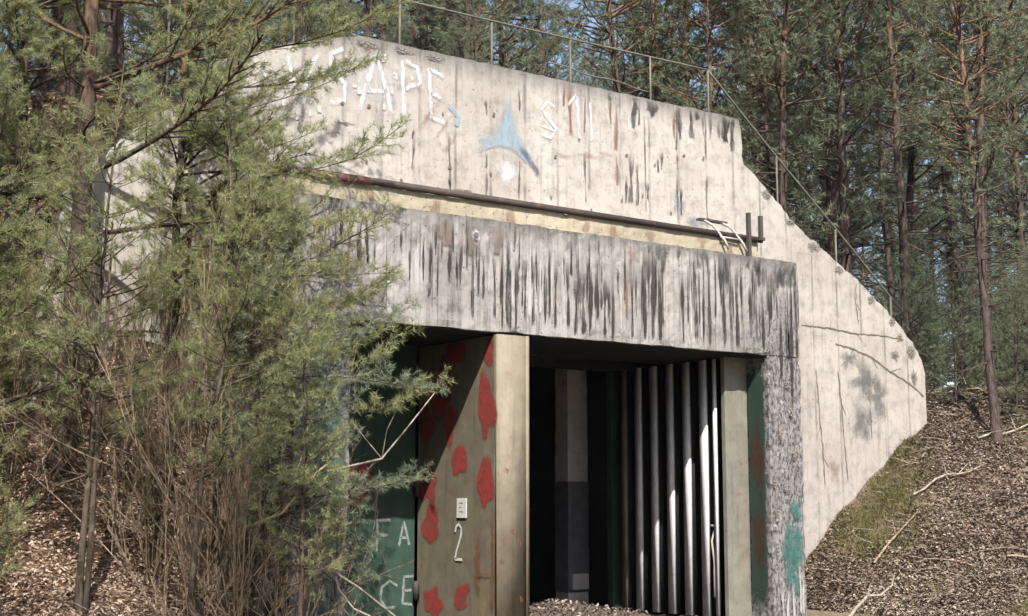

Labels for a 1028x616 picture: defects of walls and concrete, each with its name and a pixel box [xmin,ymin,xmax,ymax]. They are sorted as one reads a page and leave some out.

damp [676,114,733,152]
damp [625,146,663,204]
damp [328,206,387,275]
damp [400,222,799,403]
crack [802,283,924,485]